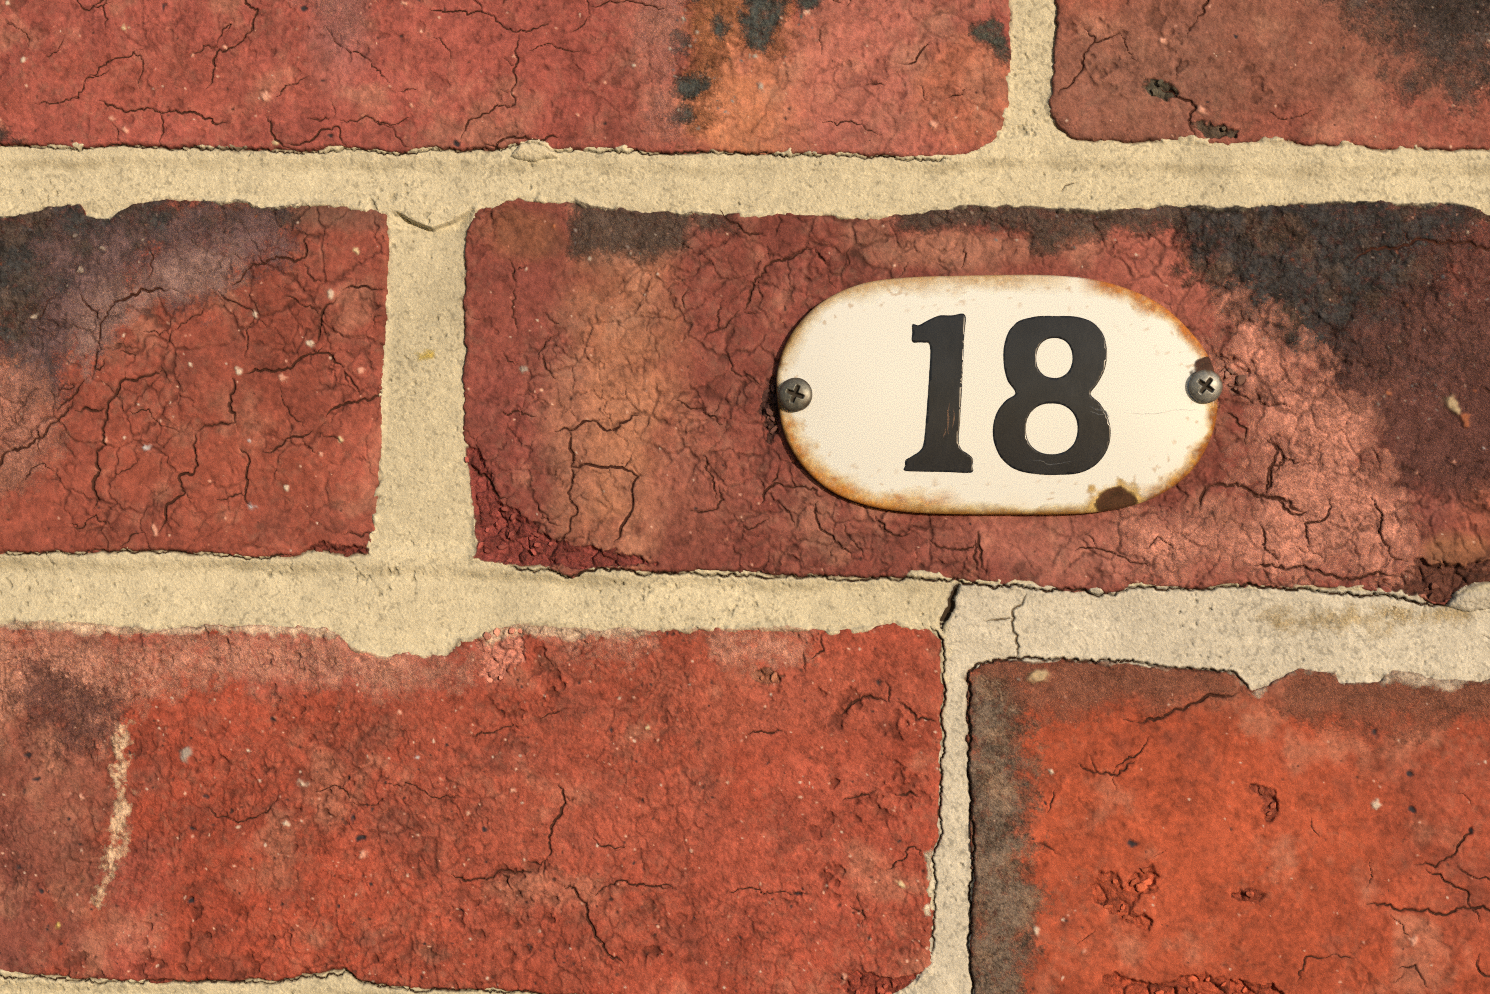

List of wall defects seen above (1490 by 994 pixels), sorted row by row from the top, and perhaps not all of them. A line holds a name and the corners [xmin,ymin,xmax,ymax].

crack [0,0,943,162]
crack [864,44,965,101]
crack [1350,230,1490,286]
crack [0,234,384,560]
crack [451,211,1443,993]
crack [205,801,276,823]
crack [316,782,460,806]
spalling [1091,865,1159,931]
crack [1369,780,1490,988]
crack [0,970,541,994]
spalling [1102,972,1283,994]